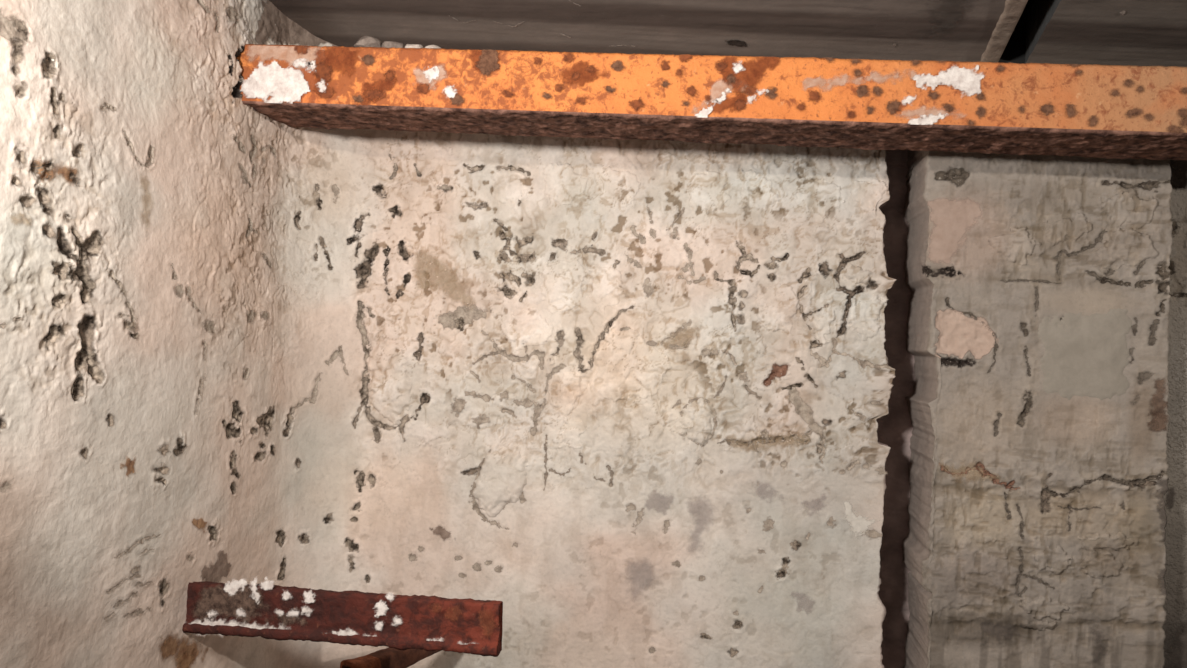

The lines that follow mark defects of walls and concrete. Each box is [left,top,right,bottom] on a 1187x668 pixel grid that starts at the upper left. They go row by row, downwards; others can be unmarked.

rust [294,45,374,99]
rust [542,53,625,104]
rust [683,56,780,113]
rust [848,59,901,118]
flaking render [491,163,641,210]
spalling [12,150,105,401]
crack [290,154,531,443]
flaking render [493,218,625,351]
crack [461,207,895,529]
flaking render [934,309,998,359]
crack [945,230,1187,436]
crack [939,462,1167,597]